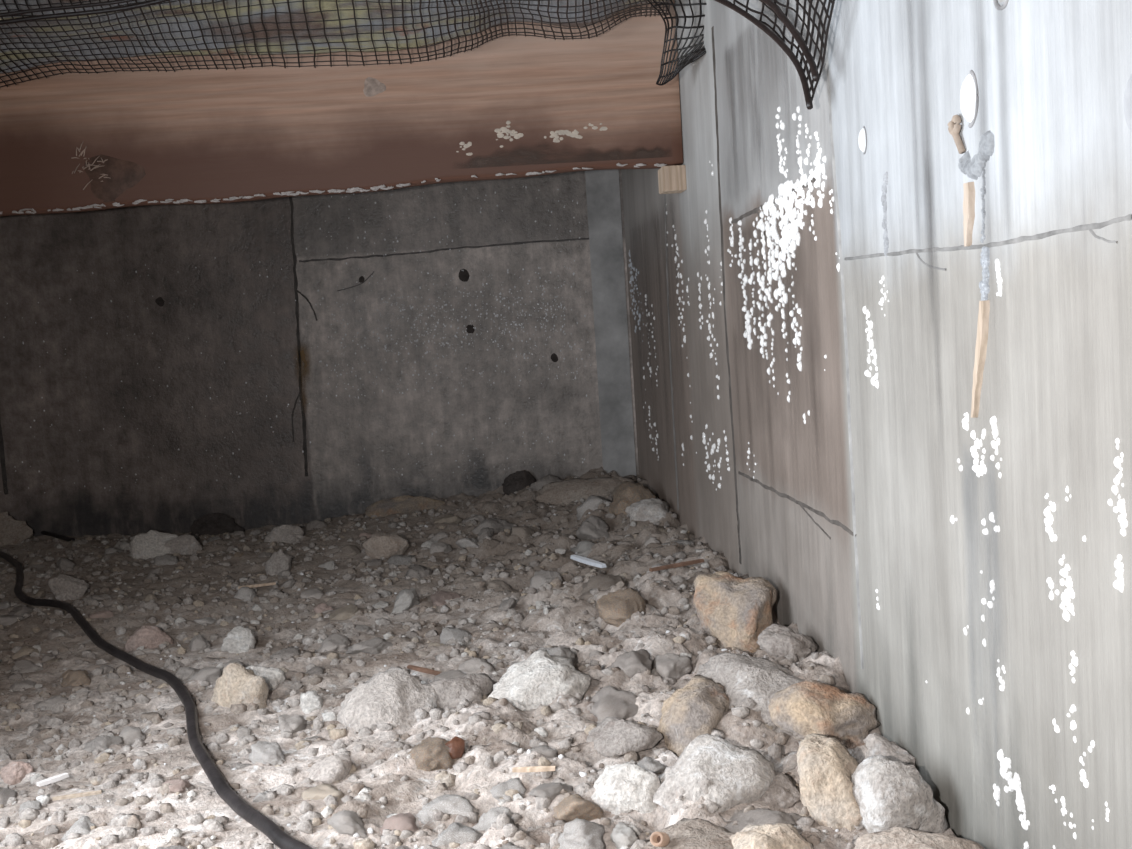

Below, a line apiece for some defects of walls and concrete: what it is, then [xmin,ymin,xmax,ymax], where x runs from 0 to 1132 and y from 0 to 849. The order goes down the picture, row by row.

leakage [666,106,834,402]
leakage [628,250,659,459]
leakage [863,275,889,388]
leakage [681,402,730,491]
leakage [957,412,1002,478]
leakage [981,512,1000,535]
leakage [1043,486,1071,542]
leakage [1107,438,1128,537]
leakage [1046,554,1075,622]
leakage [1052,705,1095,788]
leakage [993,749,1030,849]
leakage [1049,785,1076,840]